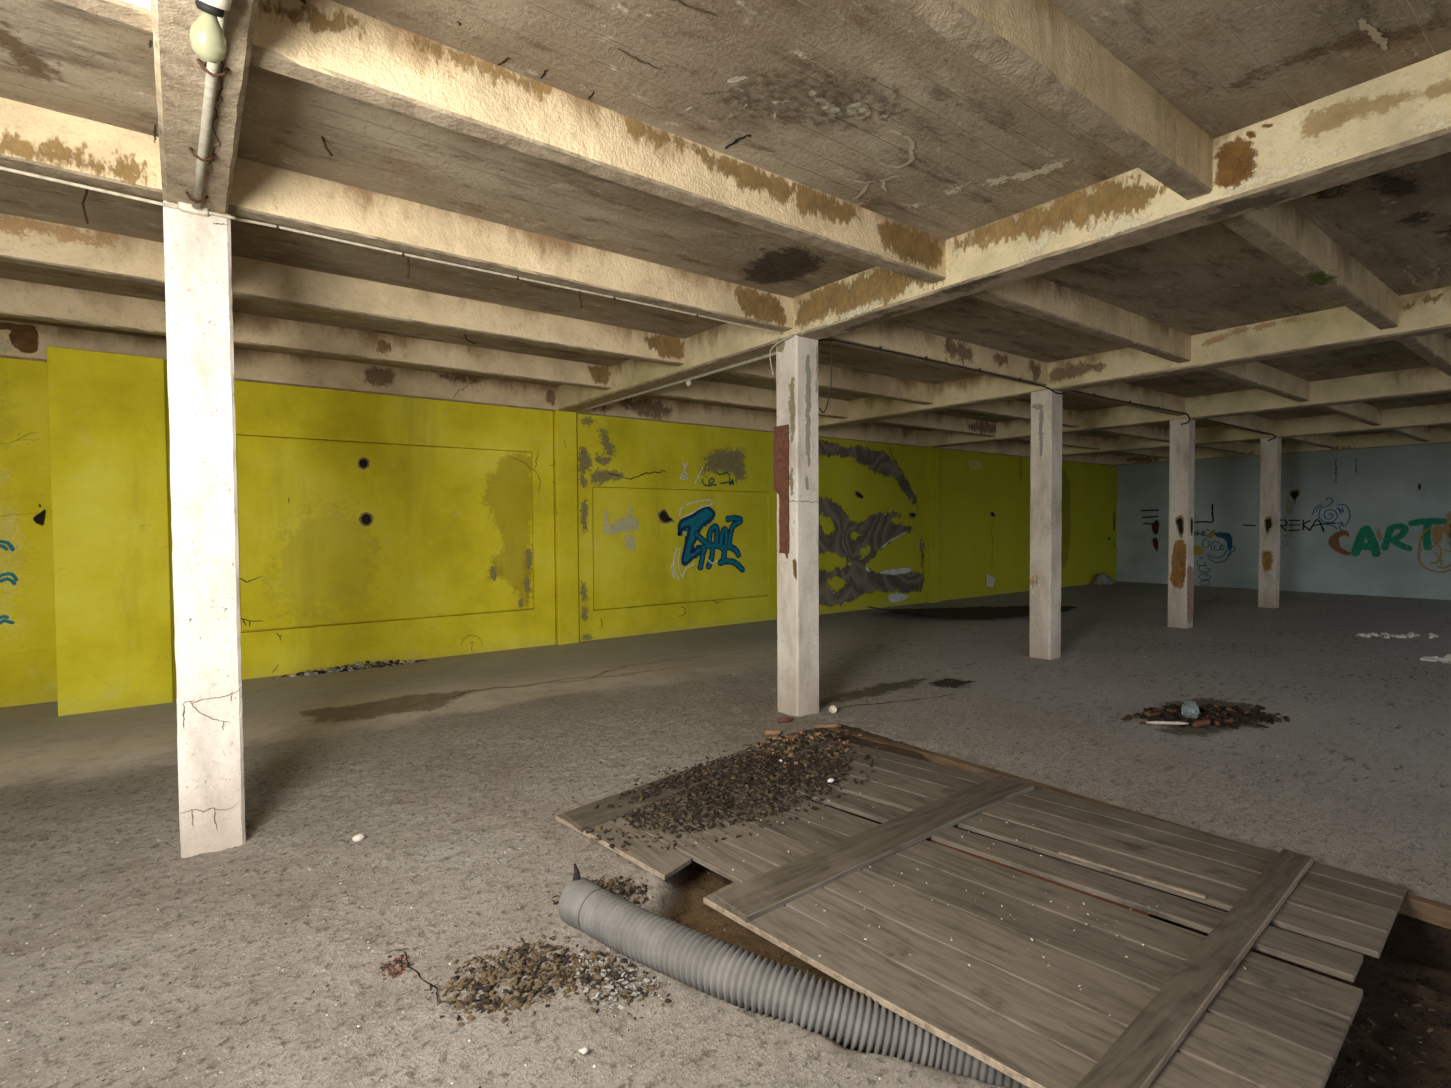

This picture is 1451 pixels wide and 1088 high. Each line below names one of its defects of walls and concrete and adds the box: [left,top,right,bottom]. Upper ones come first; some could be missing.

damp [954,175,1166,262]
corrosion [1214,124,1272,190]
damp [1203,157,1423,221]
damp [735,245,999,333]
corrosion [773,424,797,579]
corrosion [1170,540,1187,589]
corrosion [1262,550,1274,572]